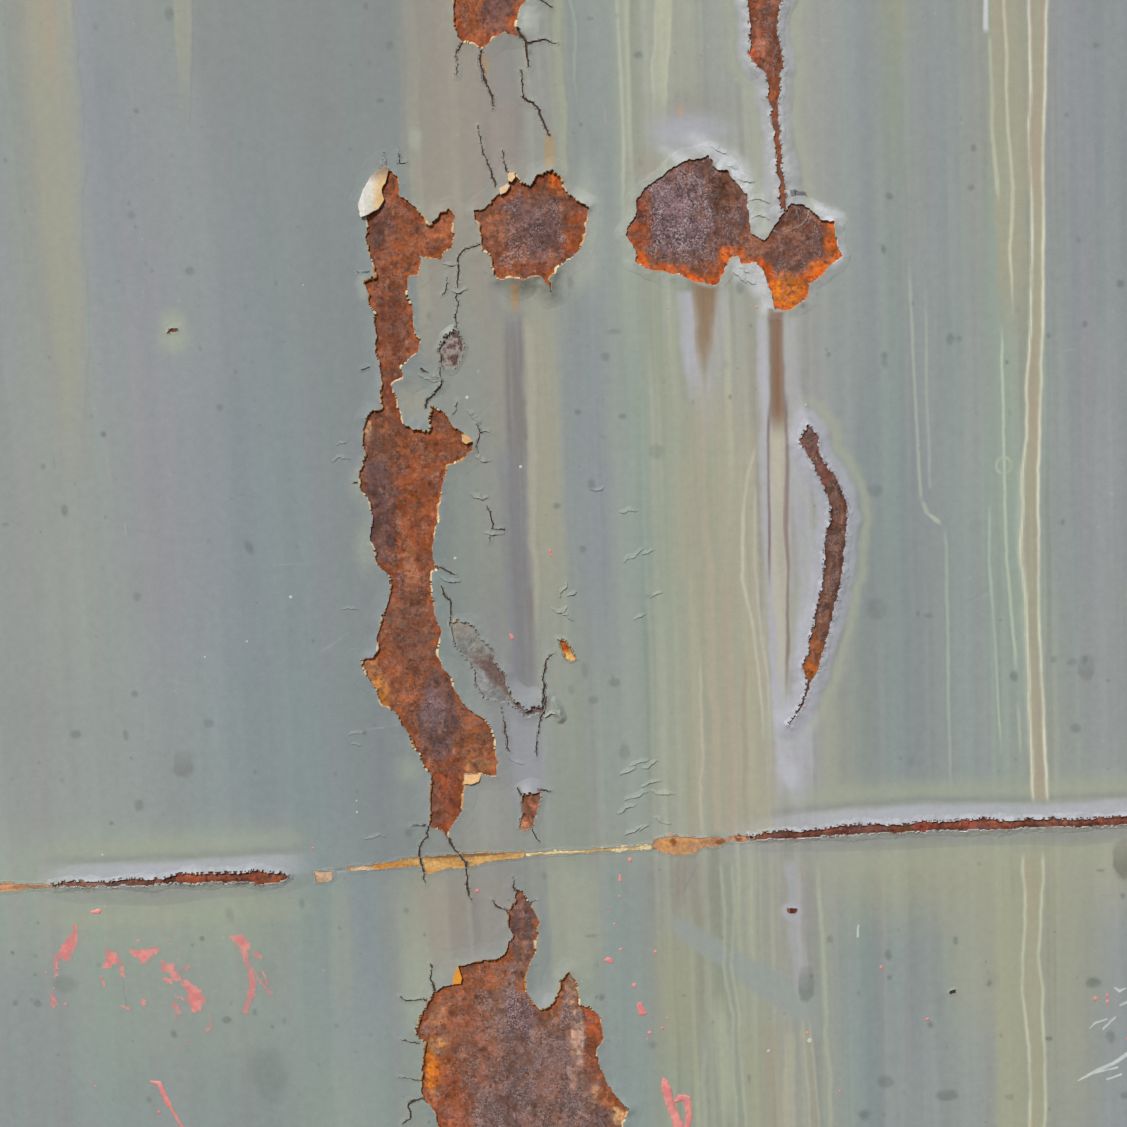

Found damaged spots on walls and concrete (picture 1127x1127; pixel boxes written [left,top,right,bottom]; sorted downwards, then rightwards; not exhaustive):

corrosion [438,0,553,79]
crack [451,0,561,189]
corrosion [343,130,601,852]
corrosion [614,141,852,812]
peeling [447,613,555,726]
crack [46,861,294,893]
crack [746,811,1127,845]
corrosion [401,875,645,1127]